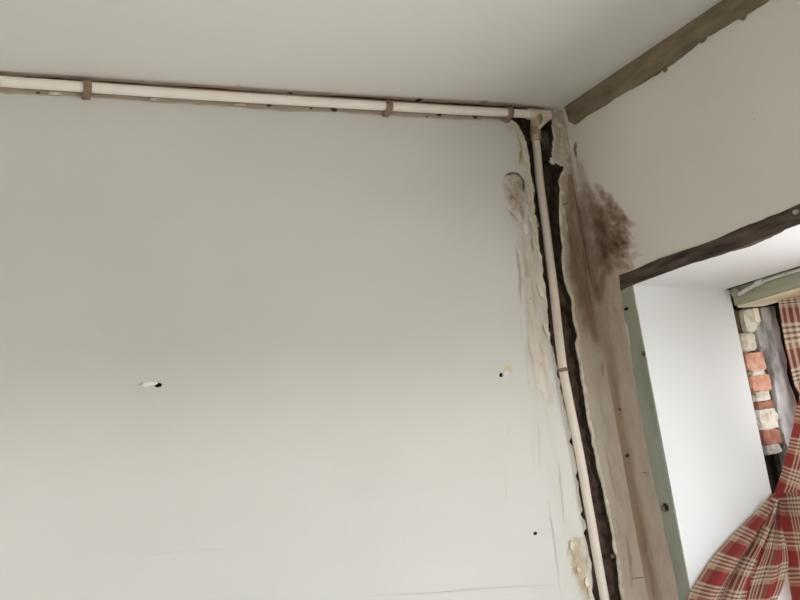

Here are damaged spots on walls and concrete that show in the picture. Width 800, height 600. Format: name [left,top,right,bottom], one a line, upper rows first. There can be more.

peeling [514,125,558,405]